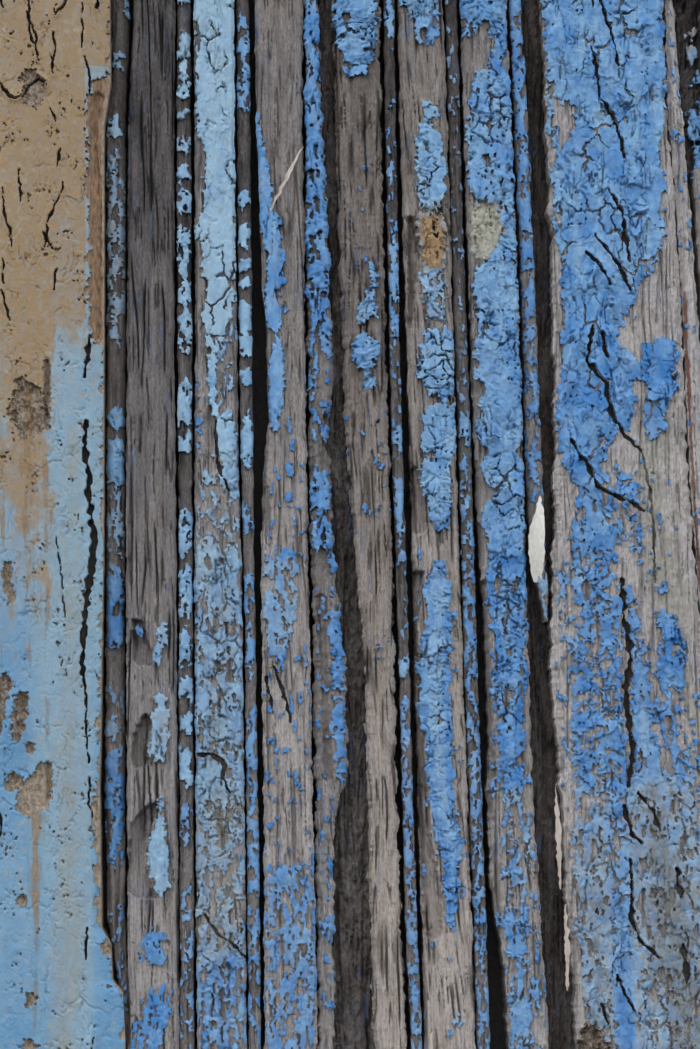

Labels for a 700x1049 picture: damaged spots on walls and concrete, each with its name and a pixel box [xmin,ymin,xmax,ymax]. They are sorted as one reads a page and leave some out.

crack [0,0,99,99]
crack [590,0,625,159]
crack [1,169,22,321]
crack [43,149,64,290]
crack [585,190,631,292]
peeling [0,0,347,1049]
peeling [303,0,700,1049]
crack [570,324,657,583]
crack [619,577,691,984]
rust [32,812,41,929]